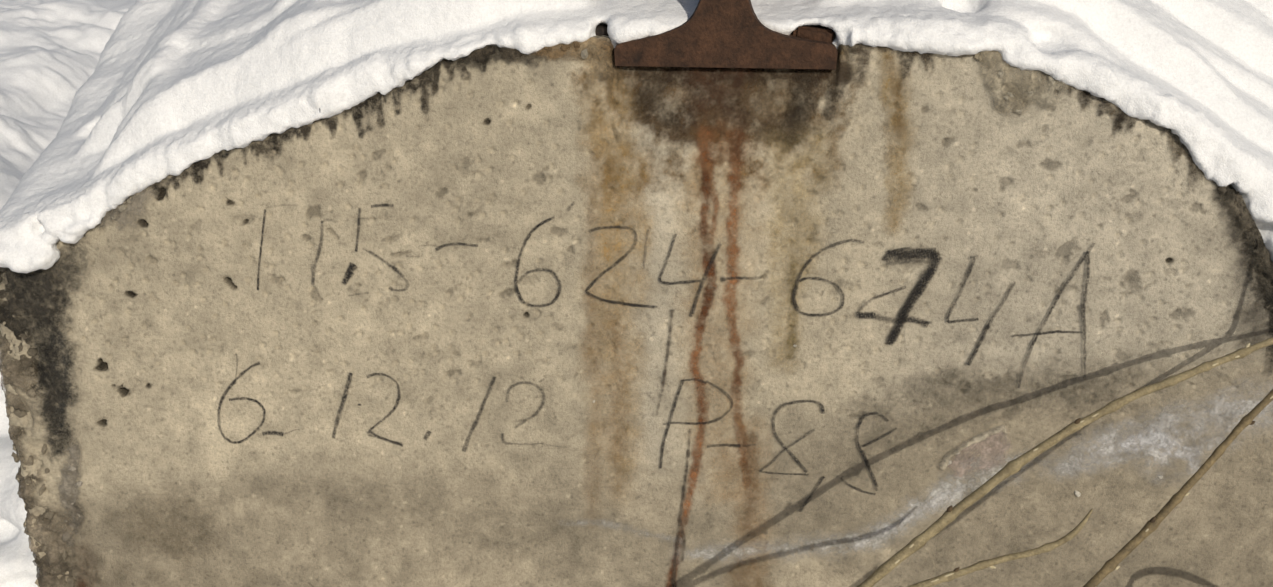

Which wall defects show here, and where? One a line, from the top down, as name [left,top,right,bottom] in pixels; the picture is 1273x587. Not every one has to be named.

rust [666,88,790,587]
water stain [607,42,851,147]